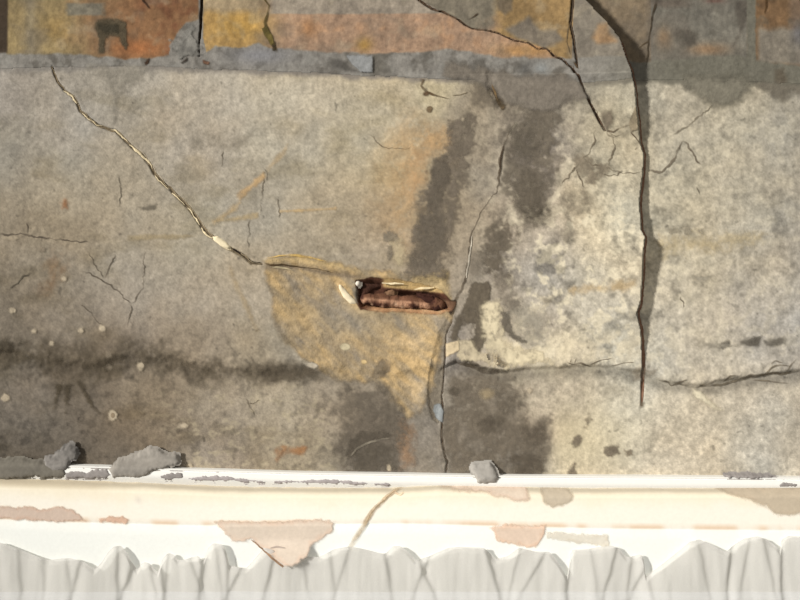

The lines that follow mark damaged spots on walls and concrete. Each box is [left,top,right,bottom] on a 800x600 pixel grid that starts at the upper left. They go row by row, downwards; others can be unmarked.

crack [51,68,262,266]
damp [406,113,475,278]
damp [499,109,561,226]
crack [418,0,710,405]
crack [3,224,139,320]
crack [428,123,517,473]
damp [256,365,313,381]
damp [373,360,390,378]
peeling [0,506,82,522]
peeling [100,516,128,524]
peeling [215,519,333,568]
peeling [492,524,609,547]